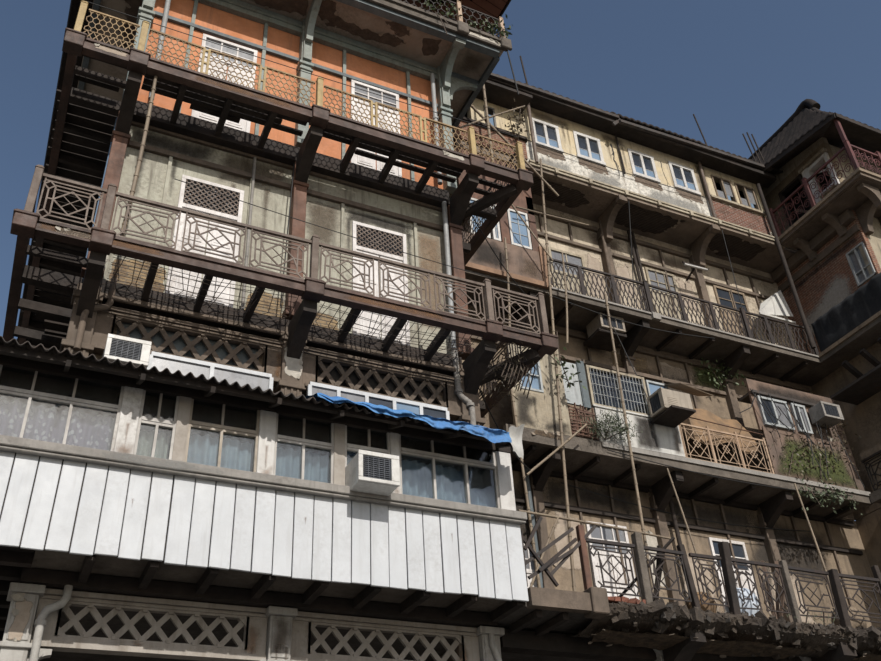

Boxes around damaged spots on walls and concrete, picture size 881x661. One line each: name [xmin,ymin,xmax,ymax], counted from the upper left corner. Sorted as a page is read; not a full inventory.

peeling [252,0,308,18]
peeling [318,0,412,47]
peeling [422,38,441,56]
peeling [284,347,303,379]